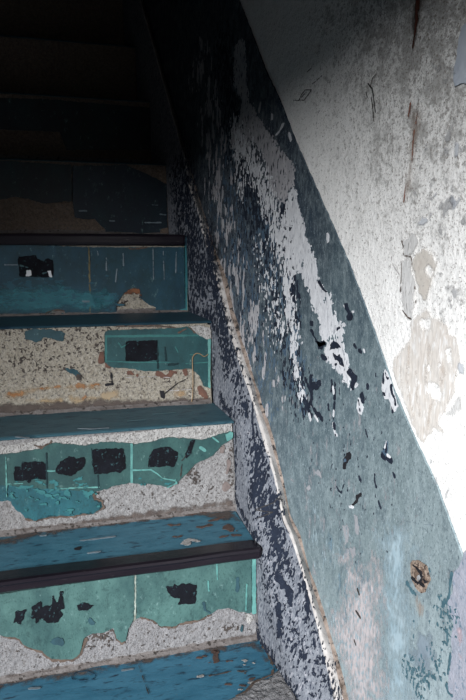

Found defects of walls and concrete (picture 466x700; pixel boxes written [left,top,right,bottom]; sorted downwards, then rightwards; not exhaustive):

flaking render [419,189,460,225]
spalling [0,18,359,700]
flaking render [354,233,464,442]
peeling [331,547,389,700]